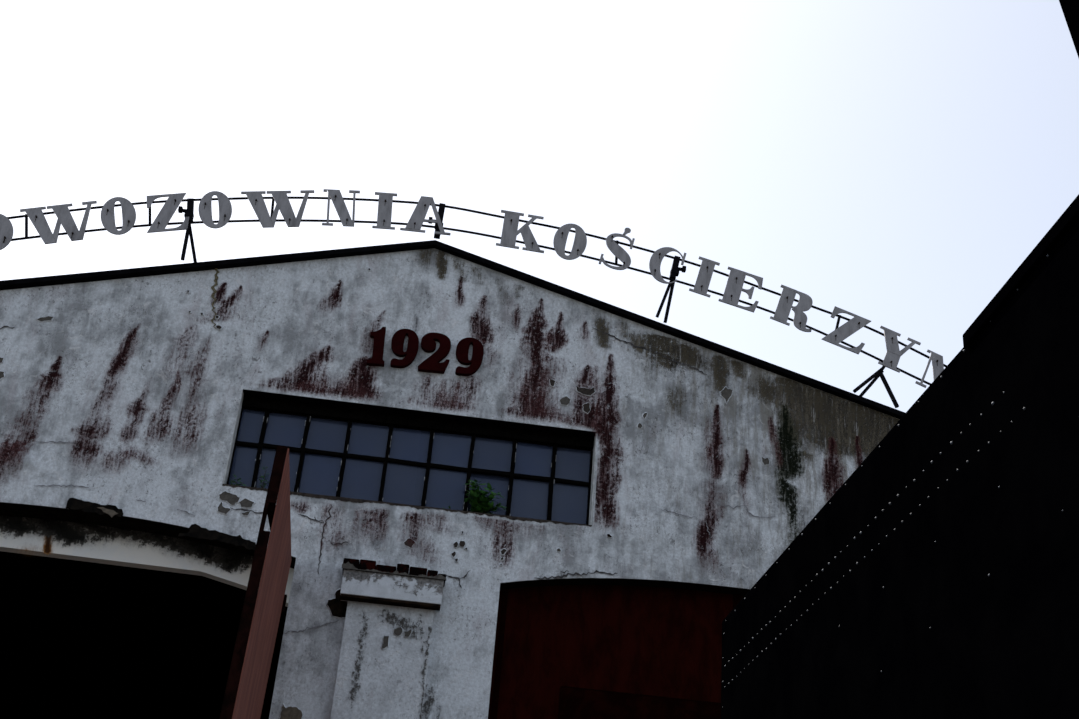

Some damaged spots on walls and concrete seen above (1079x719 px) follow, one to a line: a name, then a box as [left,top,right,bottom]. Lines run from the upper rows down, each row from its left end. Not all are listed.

rust [0,356,62,482]
rust [71,282,242,470]
rust [259,310,385,399]
rust [503,298,623,528]
flaking render [66,498,123,518]
flaking render [178,524,256,551]
flaking render [217,491,256,517]
rust [693,405,724,567]
rust [738,449,751,499]
water stain [775,405,805,544]
rust [822,436,863,501]
flaking render [278,703,304,719]